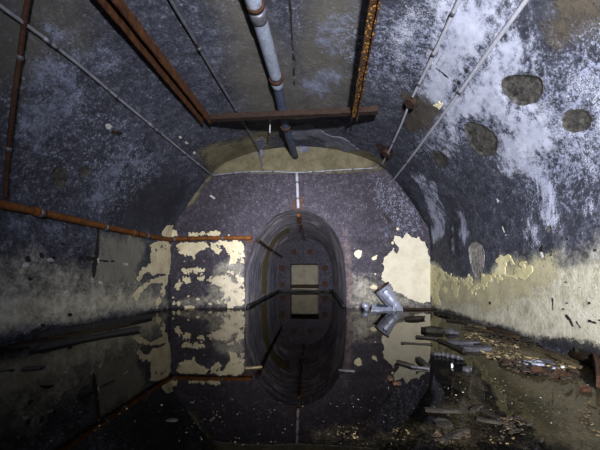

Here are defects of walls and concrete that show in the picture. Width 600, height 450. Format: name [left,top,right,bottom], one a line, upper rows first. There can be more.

spalling [464,121,498,157]
damp [380,0,600,254]
spalling [499,74,544,106]
spalling [561,108,593,133]
peeling [132,225,246,308]
peeling [370,227,533,305]